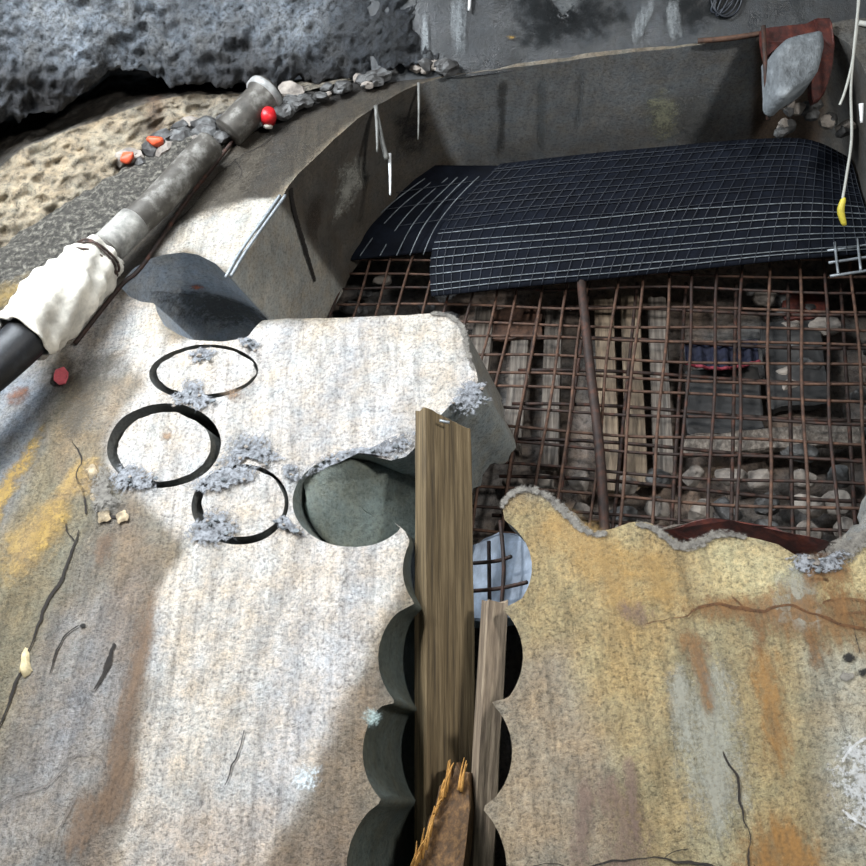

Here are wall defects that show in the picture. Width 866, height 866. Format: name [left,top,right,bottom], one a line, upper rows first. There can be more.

spalling [328,254,866,602]
crack [28,442,116,651]
crack [50,625,83,673]
crack [94,643,116,690]
crack [644,597,866,653]
corrosion [701,565,866,664]
crack [0,672,21,725]
crack [723,752,755,866]
crack [592,849,714,866]